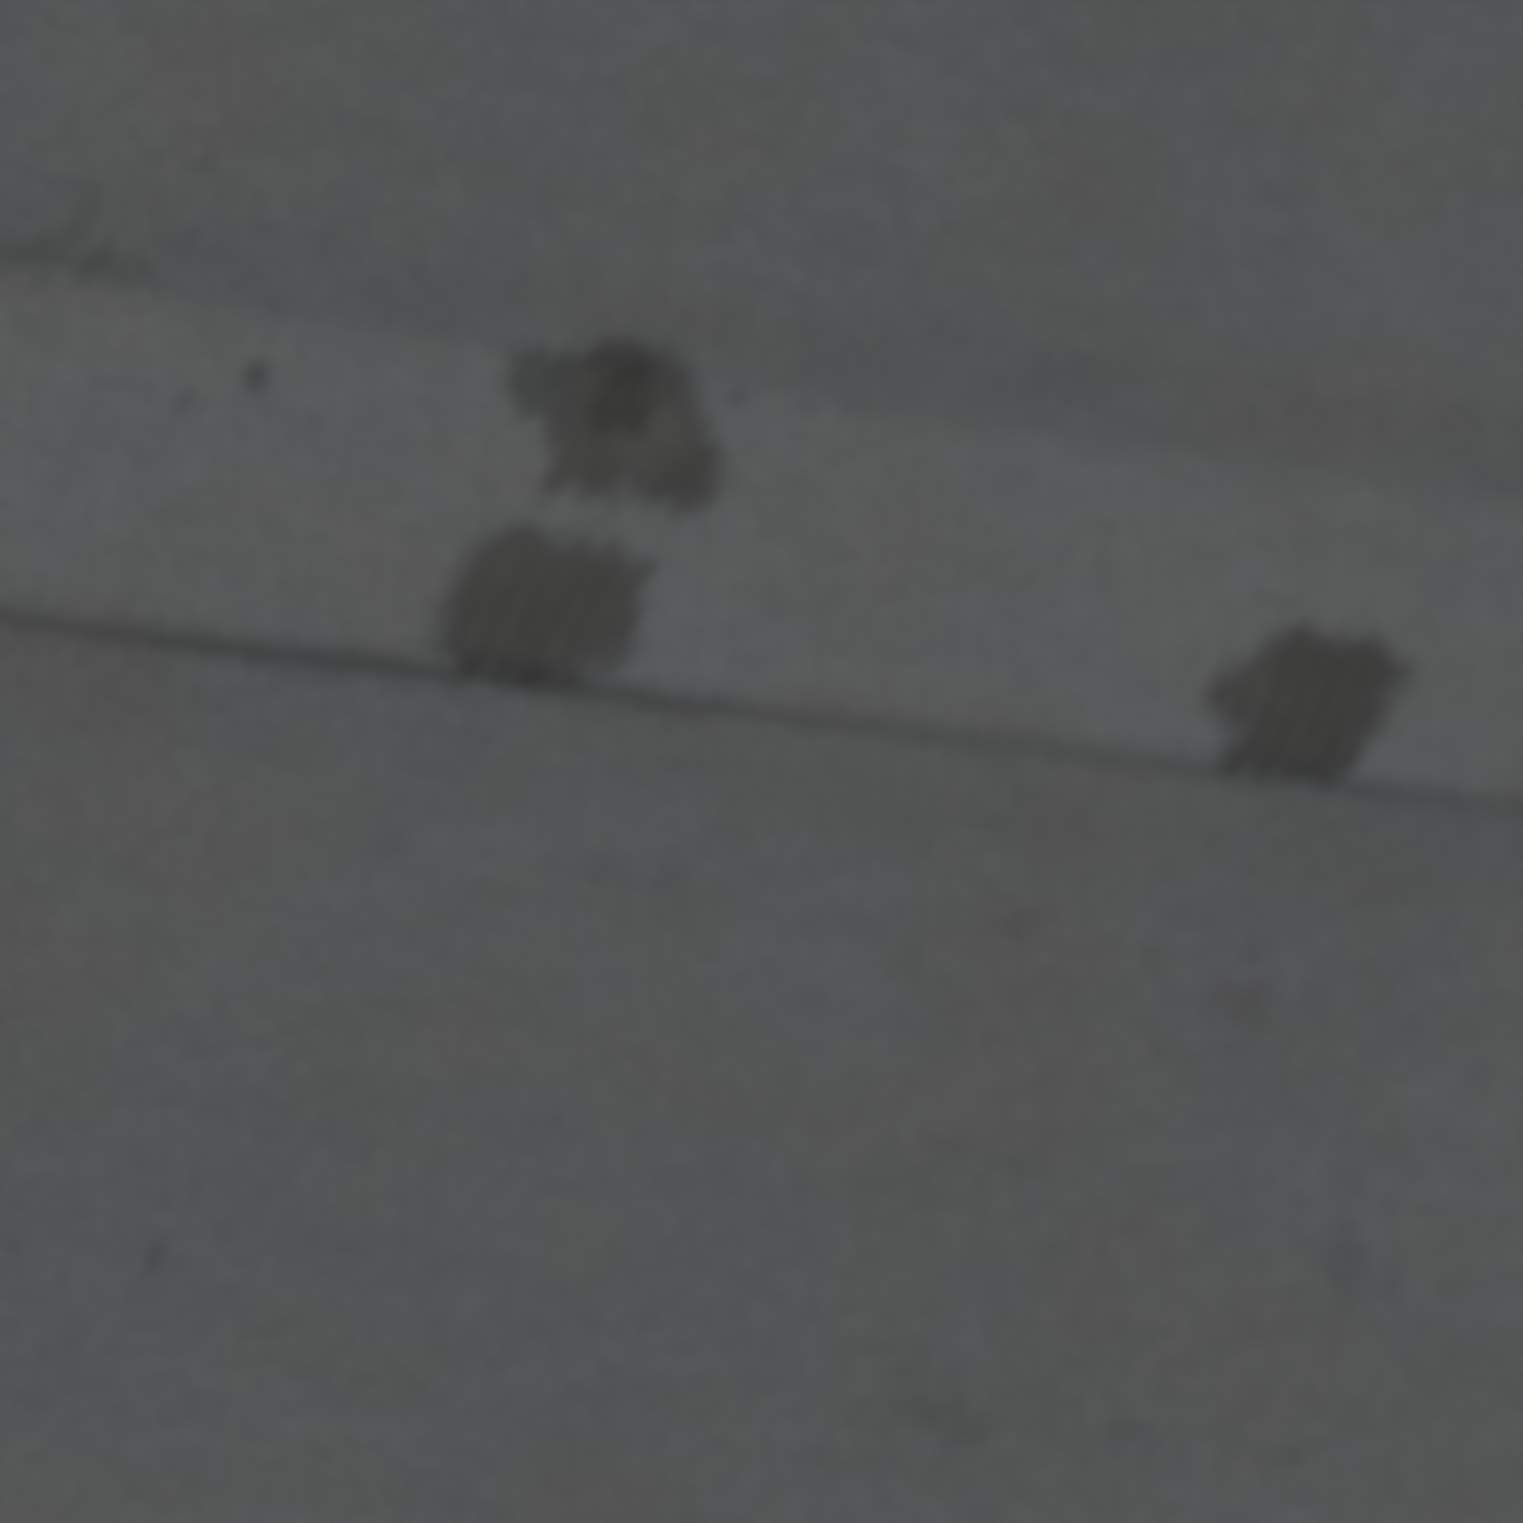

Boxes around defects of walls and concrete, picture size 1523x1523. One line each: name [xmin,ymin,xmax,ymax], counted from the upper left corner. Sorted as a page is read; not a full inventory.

damp [515,345,714,504]
damp [452,529,644,681]
damp [1215,630,1397,771]